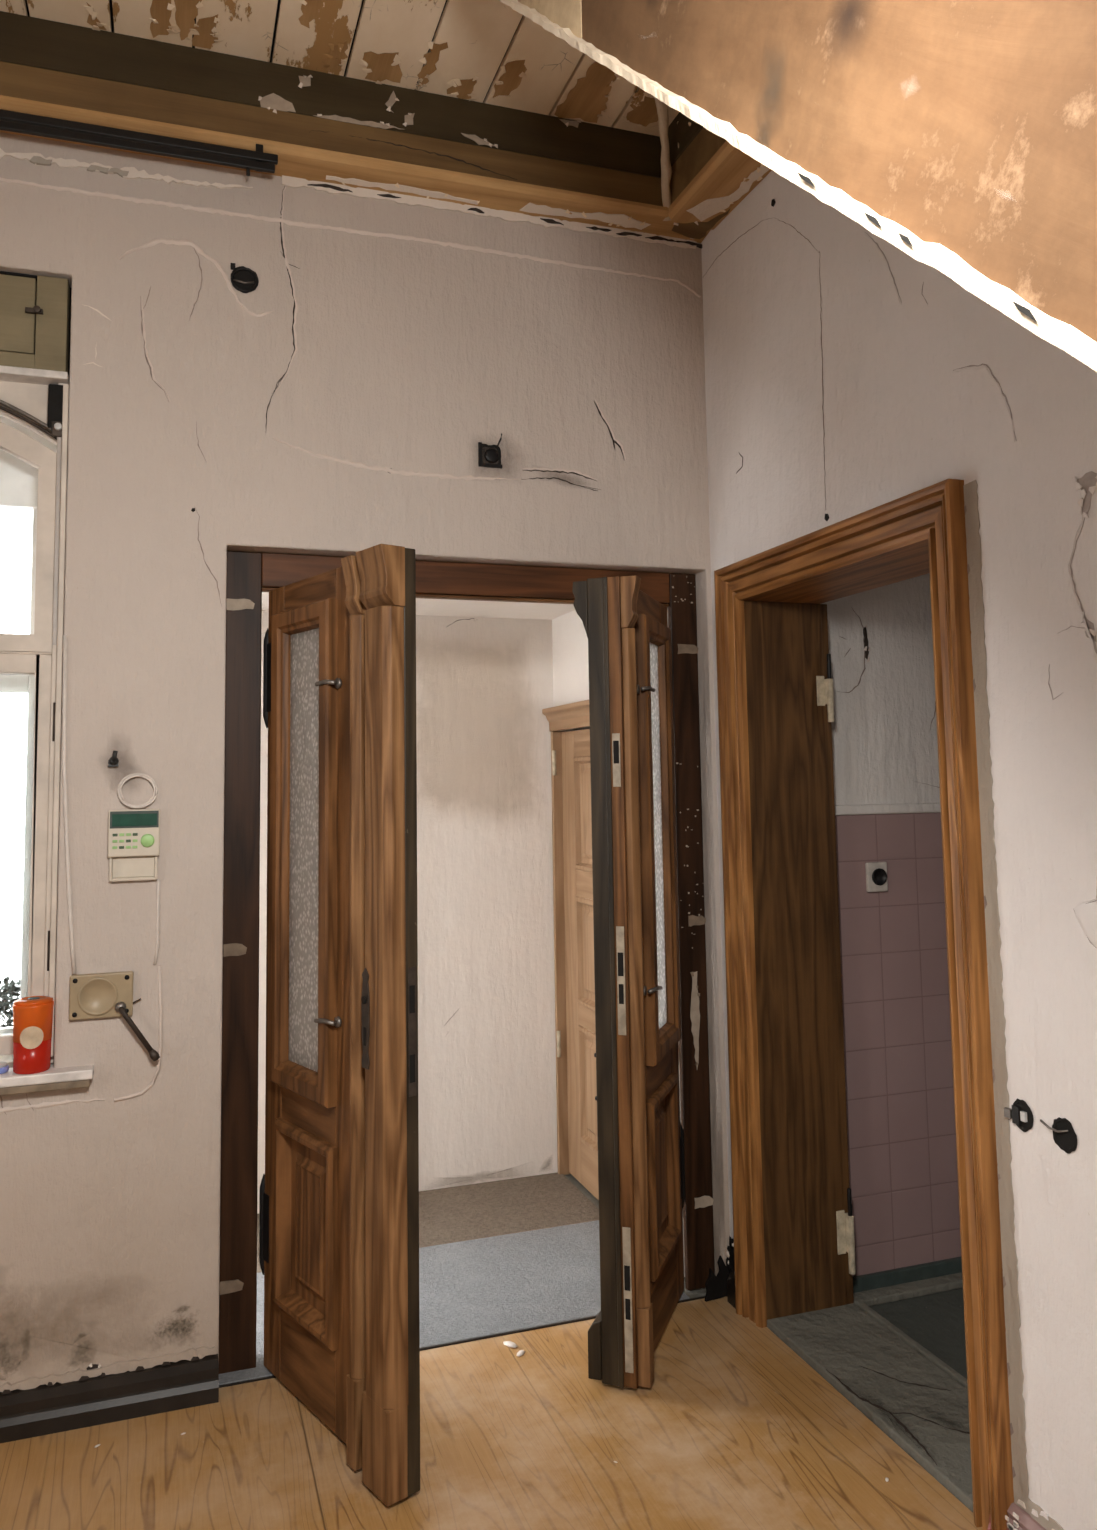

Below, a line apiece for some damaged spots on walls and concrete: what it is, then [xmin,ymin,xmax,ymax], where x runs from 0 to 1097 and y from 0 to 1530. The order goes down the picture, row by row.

peeling [149,0,223,49]
peeling [297,0,324,29]
peeling [258,41,527,129]
peeling [461,133,498,148]
peeling [554,61,620,128]
peeling [624,92,658,127]
peeling [282,163,770,249]
crack [864,232,927,304]
crack [265,186,299,434]
crack [953,363,1017,442]
crack [522,400,626,491]
crack [1048,516,1097,700]